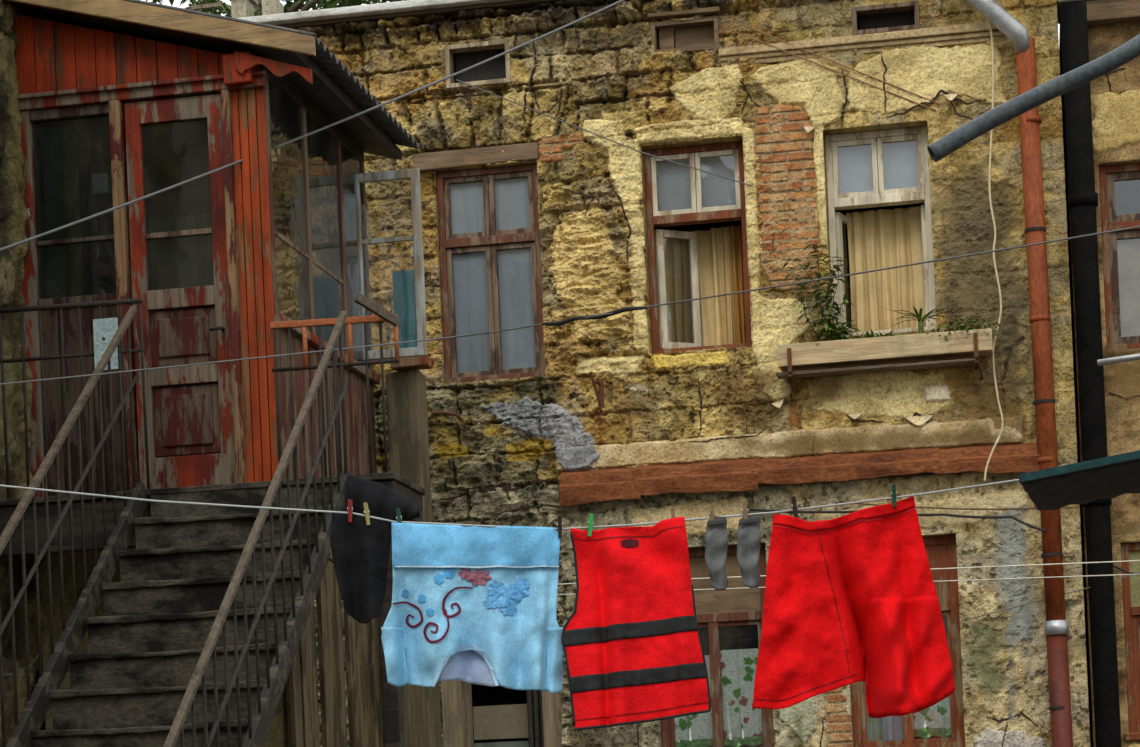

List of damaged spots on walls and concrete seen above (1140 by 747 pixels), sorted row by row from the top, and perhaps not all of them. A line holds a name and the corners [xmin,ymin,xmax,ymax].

crack [740,80,761,113]
crack [840,69,848,120]
crack [881,51,987,120]
flaking render [538,43,1007,408]
flaking render [806,370,953,426]
spalling [483,428,552,462]